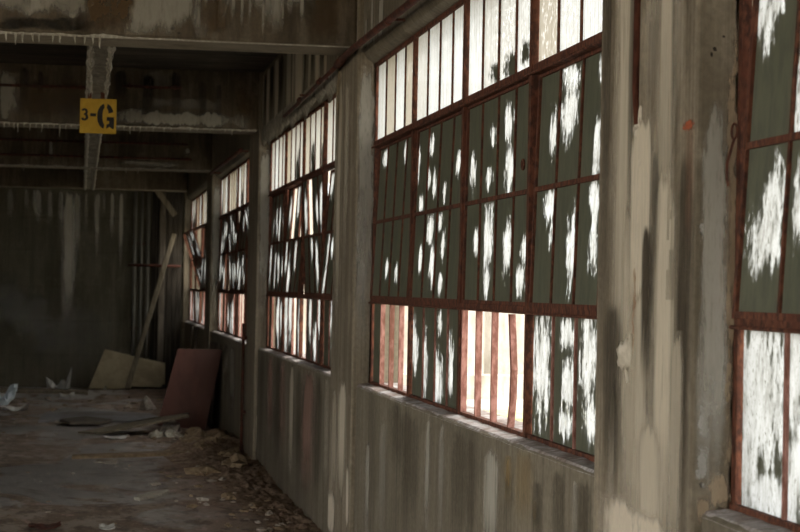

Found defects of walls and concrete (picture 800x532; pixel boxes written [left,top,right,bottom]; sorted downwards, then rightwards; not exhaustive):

water stain [0,0,350,132]
water stain [0,67,210,302]
water stain [602,0,728,532]
water stain [332,383,346,492]
water stain [484,451,497,532]